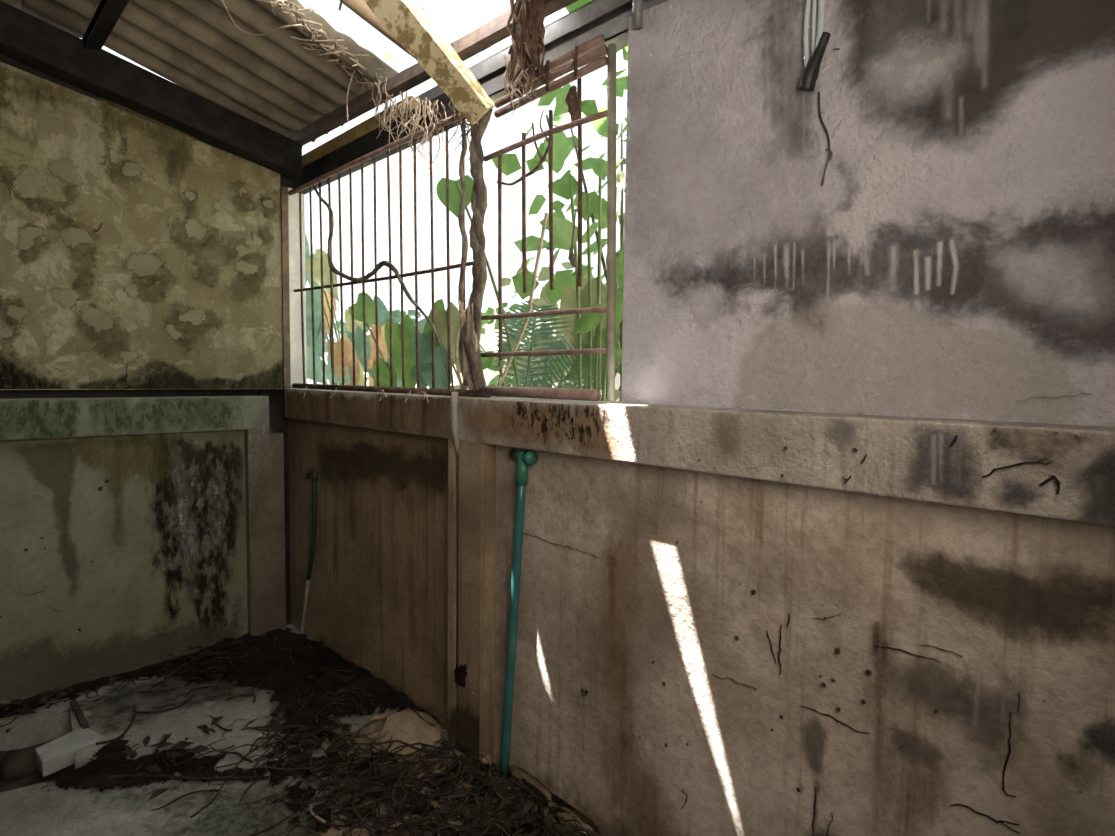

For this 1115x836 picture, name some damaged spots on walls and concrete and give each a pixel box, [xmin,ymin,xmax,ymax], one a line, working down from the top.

water stain [843,0,1115,138]
peeling [0,157,138,365]
peeling [124,253,221,354]
peeling [170,181,276,298]
water stain [669,180,1115,356]
water stain [79,361,449,437]
rust [462,405,616,455]
crack [982,458,1060,494]
water stain [0,420,267,703]
water stain [905,555,1115,640]
crack [812,787,833,836]
crack [950,692,1021,834]